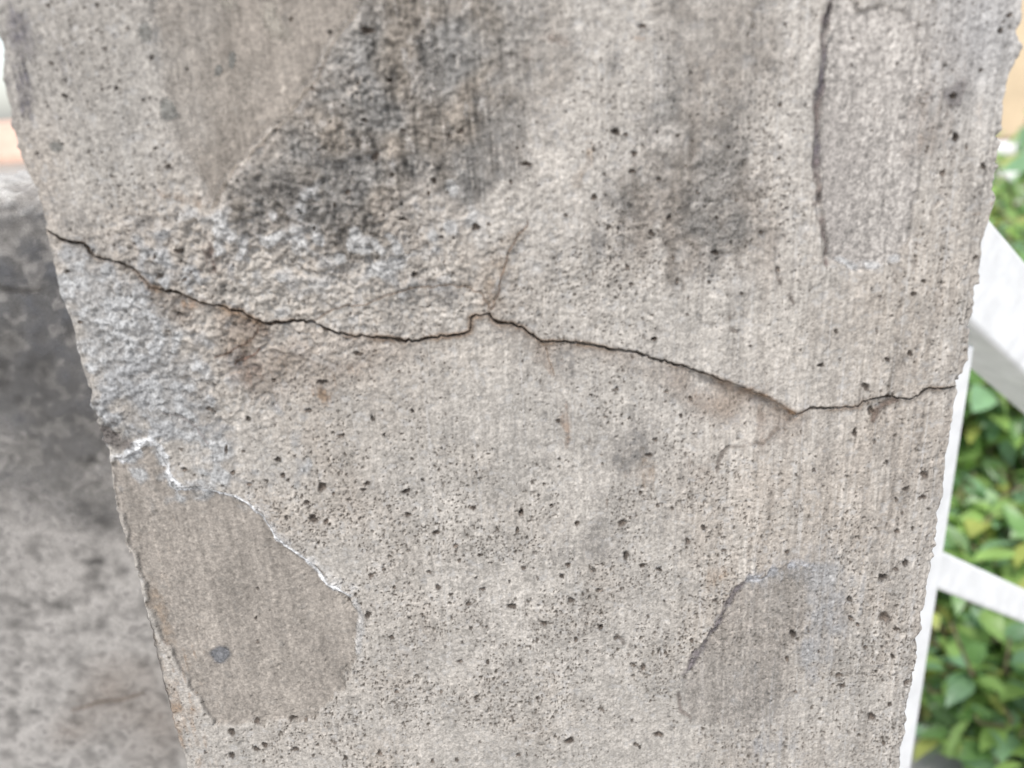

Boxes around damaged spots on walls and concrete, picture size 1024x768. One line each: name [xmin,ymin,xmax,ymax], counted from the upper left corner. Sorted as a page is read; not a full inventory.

crack [48,220,571,365]
crack [597,345,831,445]
crack [862,386,953,422]
spalling [99,425,372,736]